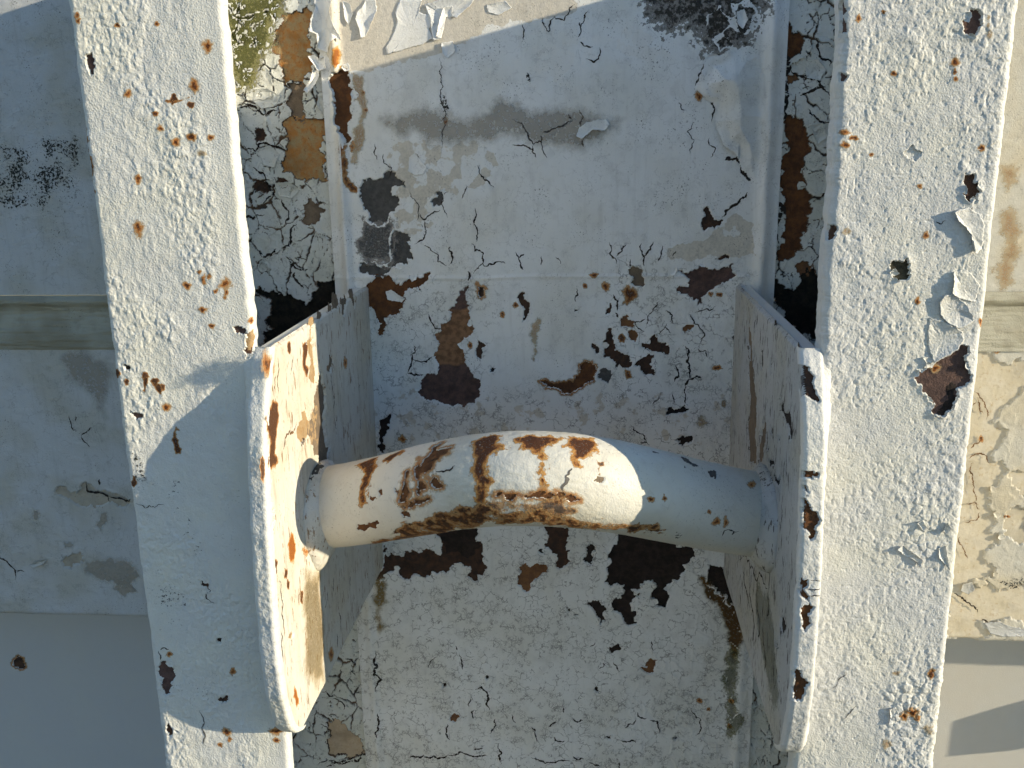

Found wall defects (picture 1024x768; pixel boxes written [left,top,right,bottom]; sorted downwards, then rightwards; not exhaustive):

mould [0,135,83,208]
rust [152,78,215,156]
crack [228,0,335,391]
damp [385,96,599,145]
peeling [415,281,496,407]
rust [259,399,279,484]
rust [356,433,666,544]
peeling [914,271,1024,638]
peeling [583,524,695,625]
crack [292,579,382,768]
crack [410,647,660,768]
damp [722,647,745,737]